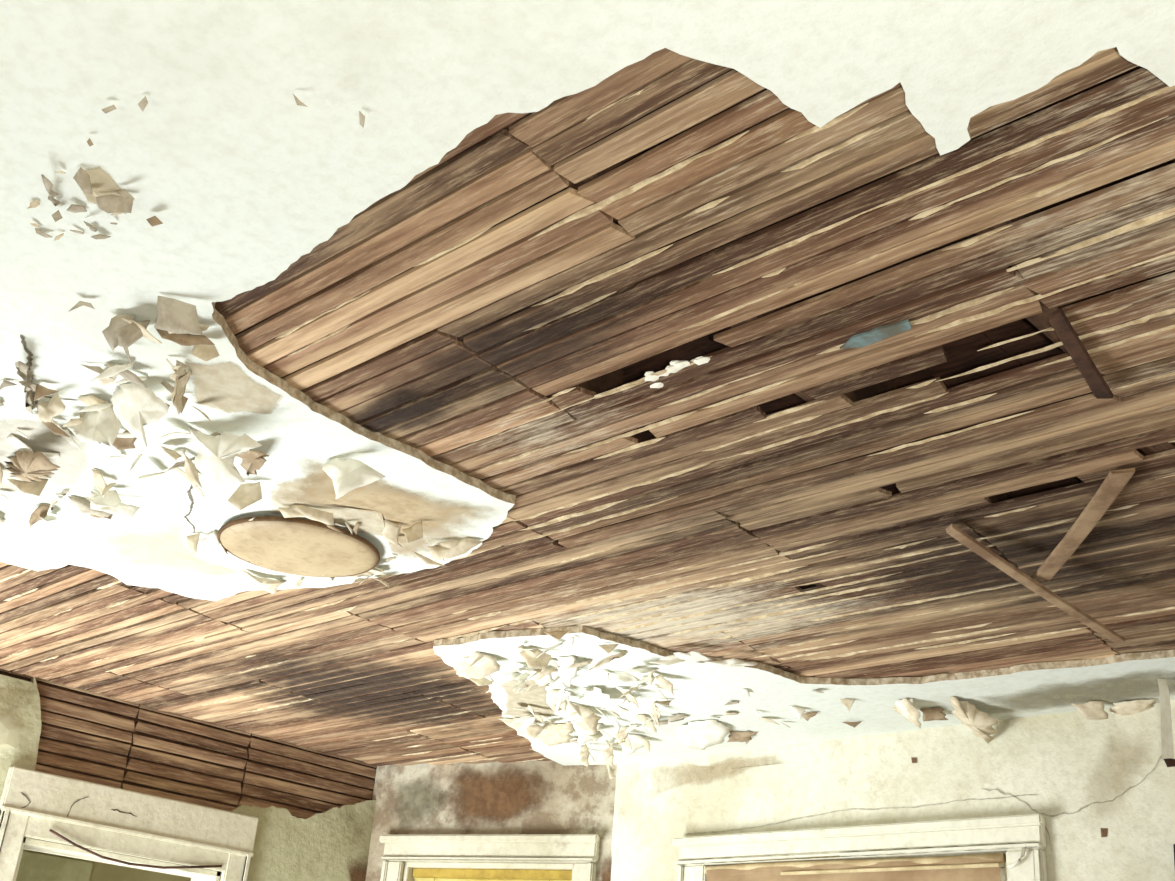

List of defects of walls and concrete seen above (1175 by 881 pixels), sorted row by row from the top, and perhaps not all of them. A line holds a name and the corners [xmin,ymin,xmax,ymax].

peeling [27,167,135,241]
crack [20,335,77,408]
flaking render [978,327,1054,351]
peeling [0,296,280,528]
peeling [273,458,423,547]
flaking render [35,678,377,819]
peeling [454,642,612,767]
peeling [649,651,757,668]
peeling [892,697,999,743]
damp [1008,675,1175,708]
peeling [1072,678,1175,767]
spalling [454,769,539,822]